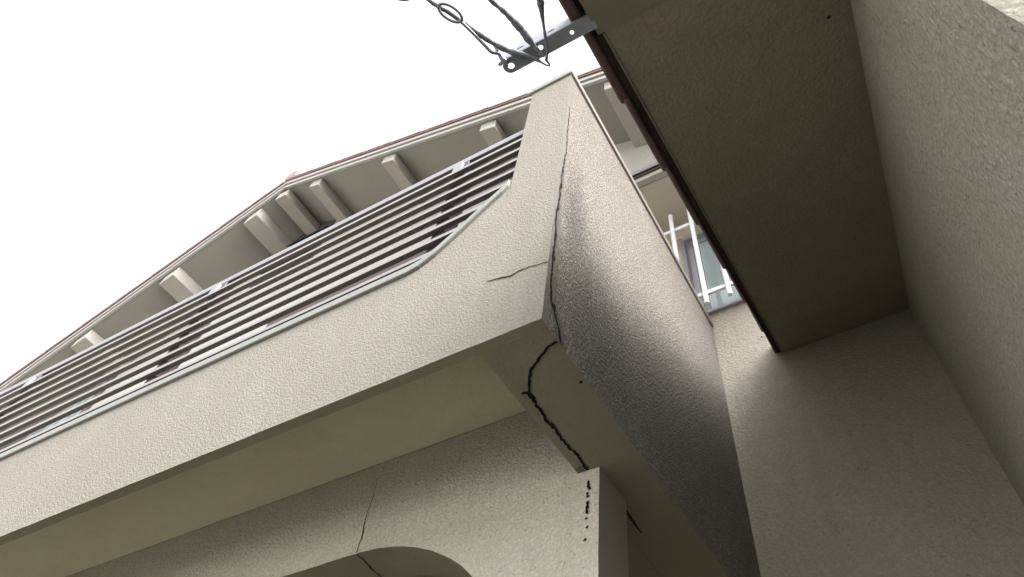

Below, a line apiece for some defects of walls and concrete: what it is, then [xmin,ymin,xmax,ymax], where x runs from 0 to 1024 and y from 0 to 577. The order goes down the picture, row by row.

crack [487,108,589,473]
crack [356,482,381,577]